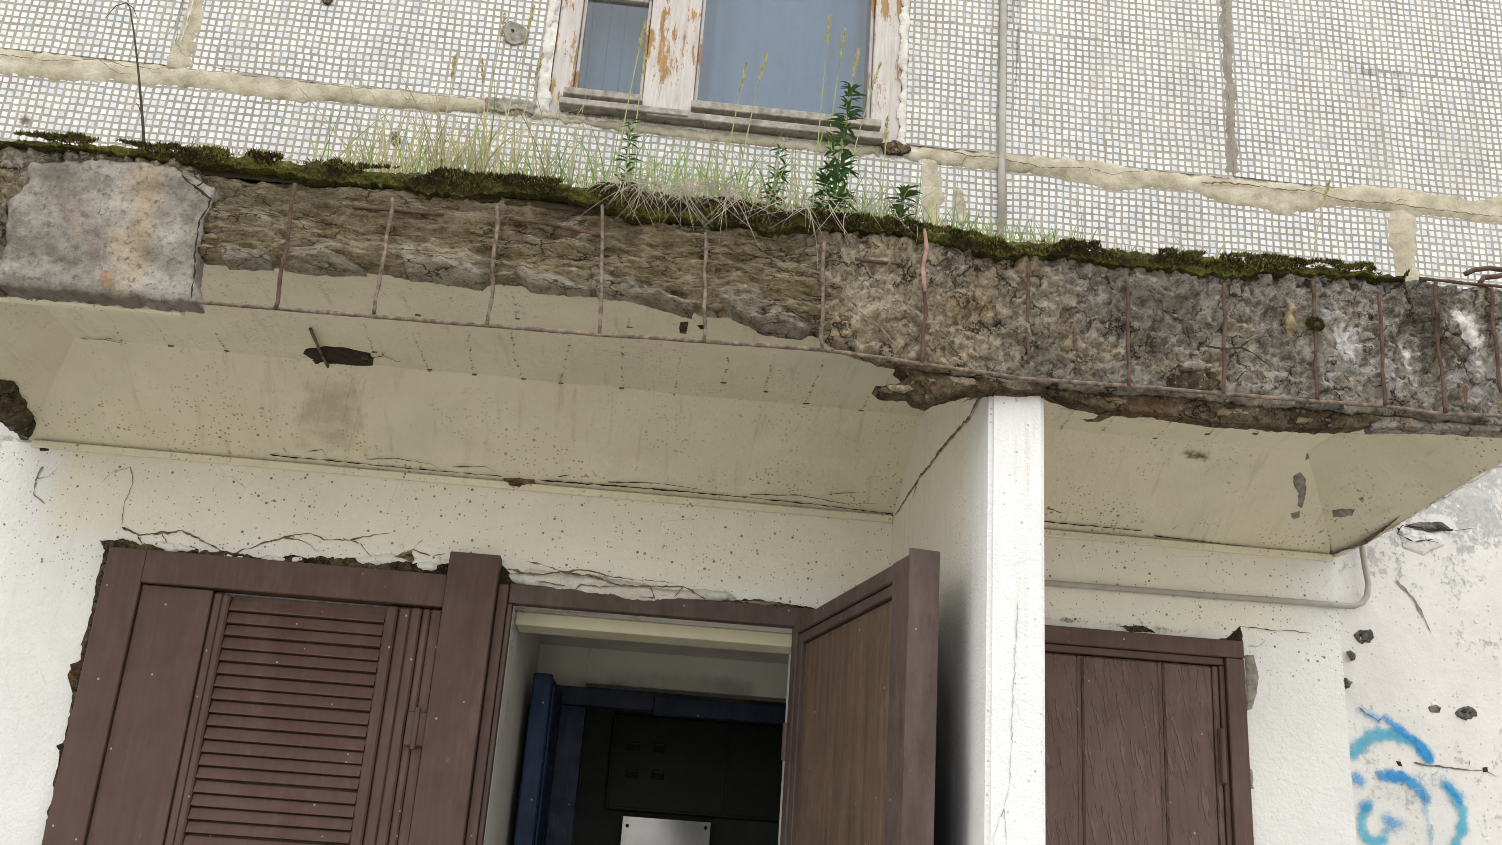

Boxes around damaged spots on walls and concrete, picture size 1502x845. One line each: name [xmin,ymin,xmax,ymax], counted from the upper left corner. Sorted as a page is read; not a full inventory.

spalling [0,146,1502,438]
spalling [0,379,49,451]
crack [33,466,54,504]
flaking render [503,478,536,487]
peeling [1291,453,1309,519]
crack [102,467,445,558]
peeling [1332,497,1364,517]
flaking render [1405,522,1450,540]
crack [507,561,705,599]
flaking render [1346,629,1374,661]
flaking render [1428,701,1477,720]